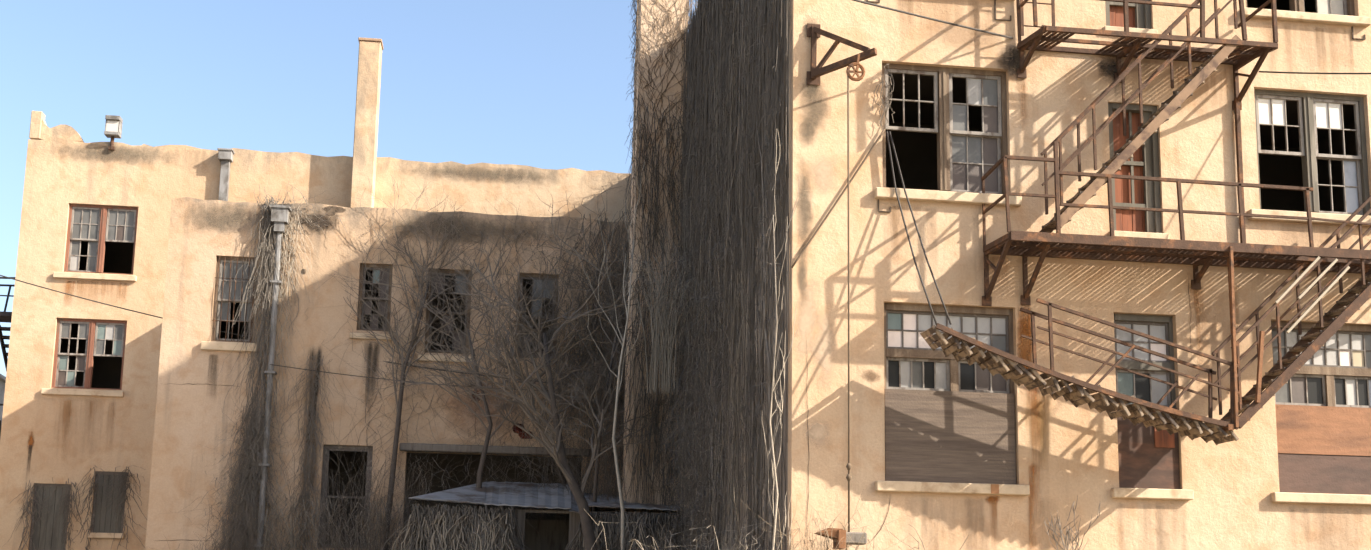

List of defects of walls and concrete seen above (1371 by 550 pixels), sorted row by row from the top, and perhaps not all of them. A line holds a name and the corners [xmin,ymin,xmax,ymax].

water stain [86,148,143,160]
water stain [205,210,249,229]
water stain [302,214,333,231]
rust [986,484,999,512]